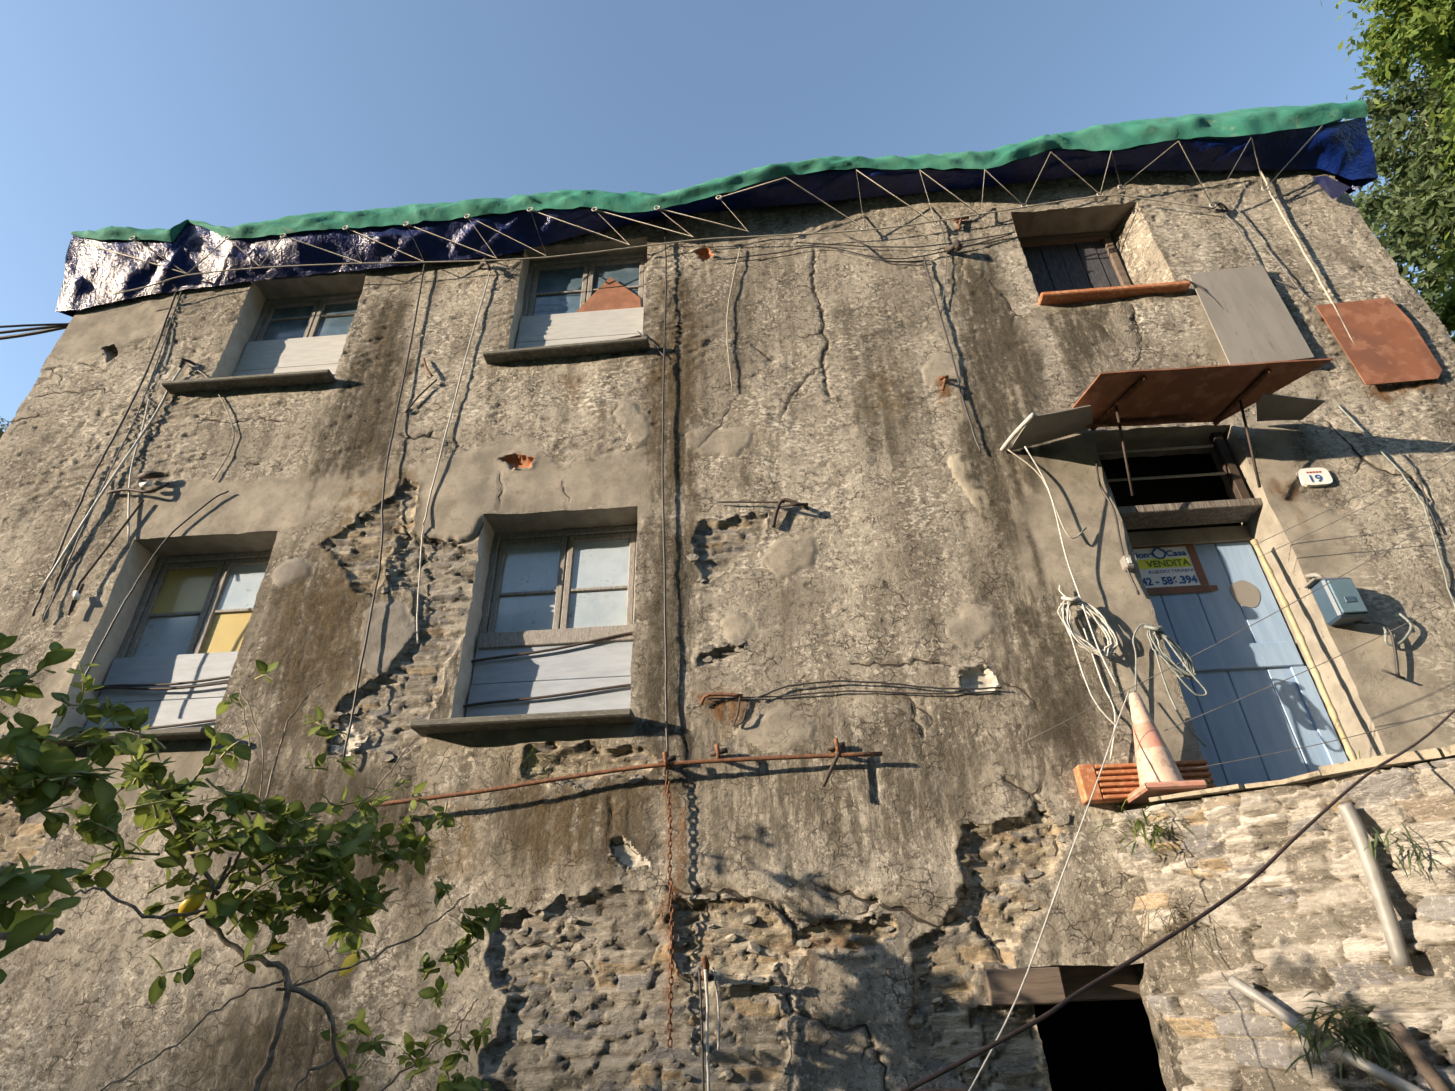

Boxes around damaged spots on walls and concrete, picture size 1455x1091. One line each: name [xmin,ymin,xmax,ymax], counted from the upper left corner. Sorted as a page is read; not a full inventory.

leakage [311,300,413,531]
spalling [321,477,478,762]
spalling [500,453,534,470]
leakage [642,521,694,792]
leakage [650,274,694,498]
crack [698,402,731,448]
spalling [686,511,769,584]
crack [781,250,830,422]
leakage [961,257,1044,584]
spalling [481,799,1069,1091]